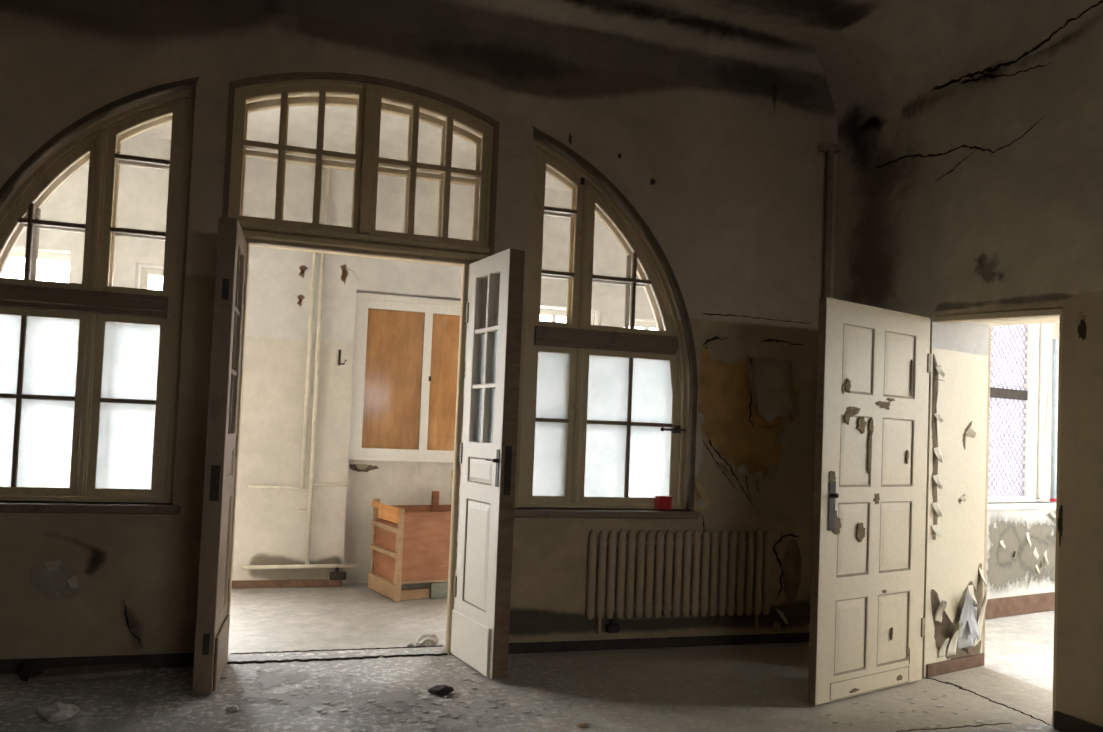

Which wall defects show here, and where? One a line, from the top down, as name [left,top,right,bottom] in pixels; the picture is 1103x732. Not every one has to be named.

damp [730,0,850,26]
crack [931,0,1103,92]
crack [896,116,1044,182]
peeling [694,398,710,510]
peeling [931,353,945,540]
peeling [962,421,976,449]
peeling [1026,532,1049,581]
spalling [1046,505,1063,545]
peeling [931,563,988,659]
crack [896,678,1050,732]